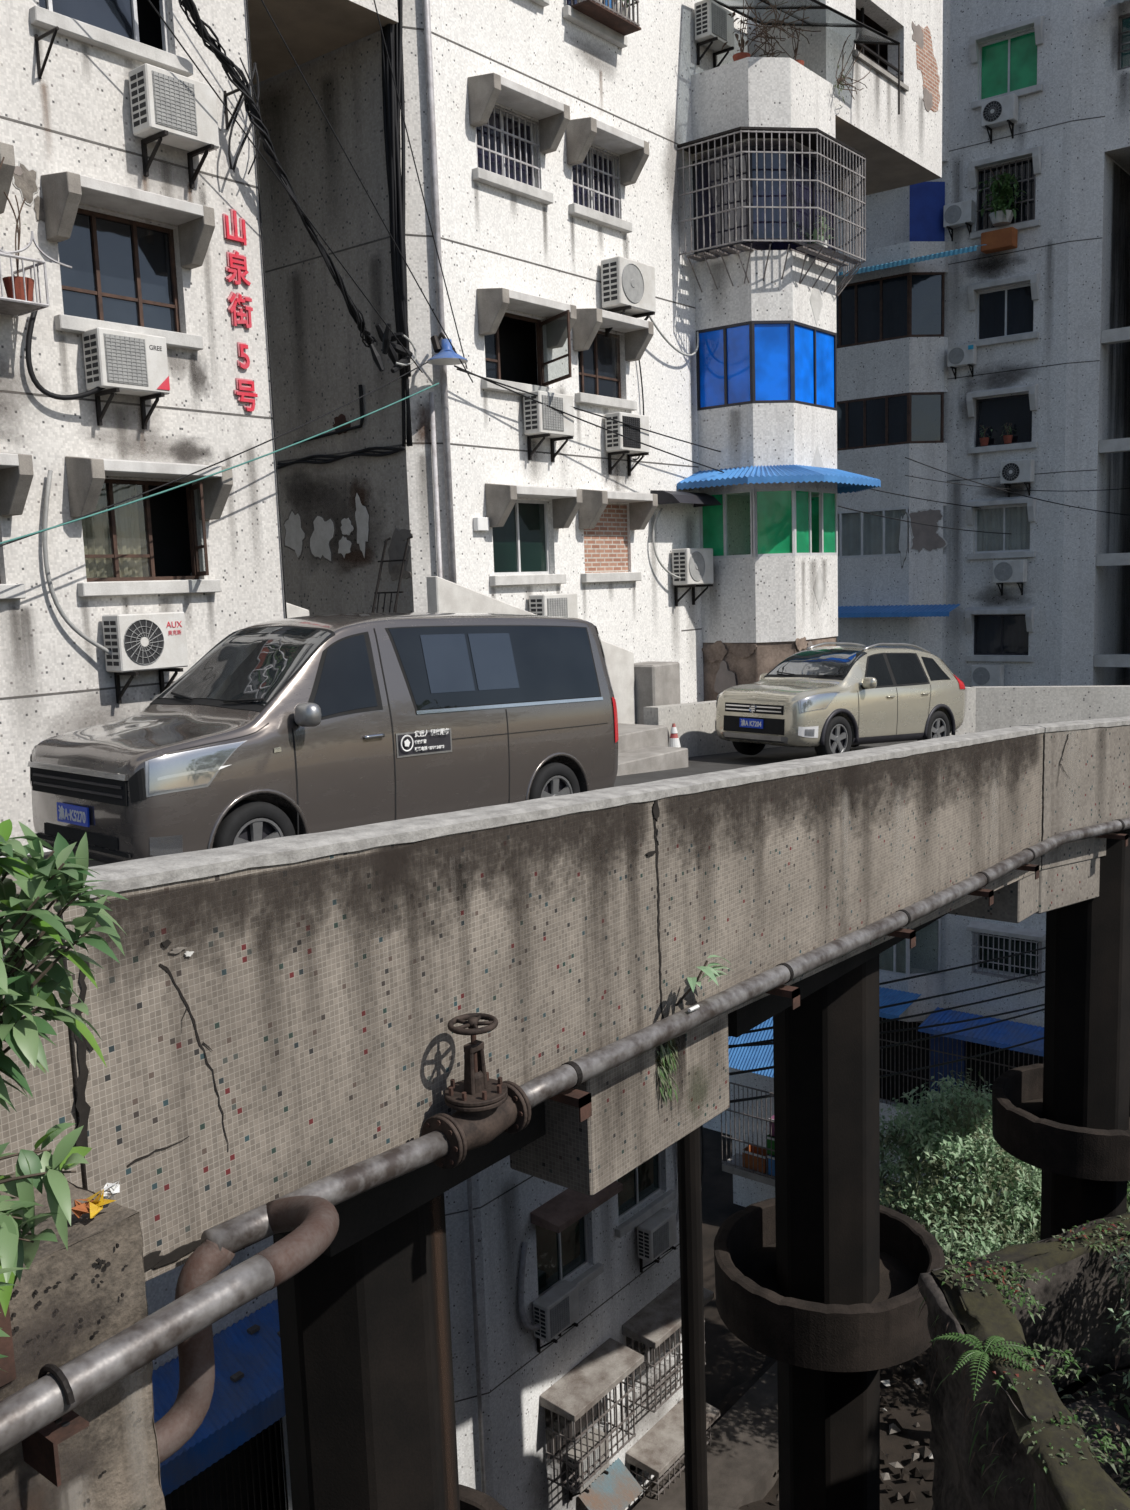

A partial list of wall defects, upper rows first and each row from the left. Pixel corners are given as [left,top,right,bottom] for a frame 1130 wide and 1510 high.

flaking render [912,21,940,112]
peeling [283,490,370,563]
damp [290,479,372,567]
flaking render [898,508,948,569]
damp [666,734,1038,854]
damp [99,802,645,958]
crack [652,806,666,1055]
crack [127,964,229,1167]